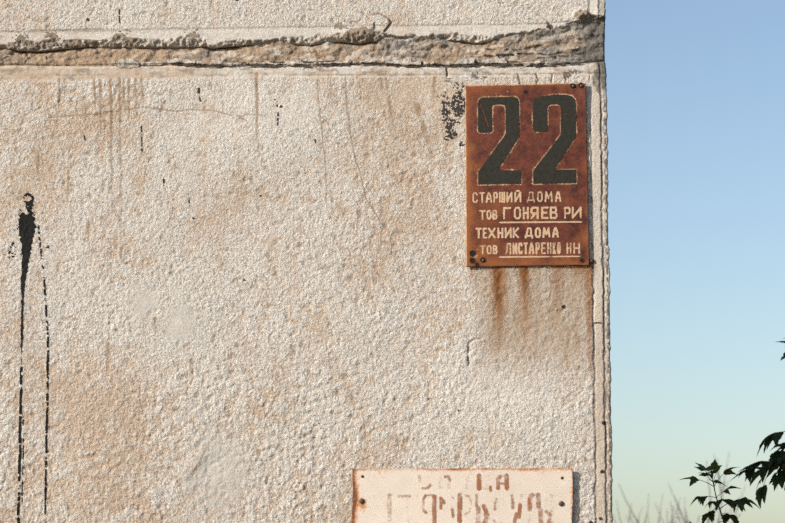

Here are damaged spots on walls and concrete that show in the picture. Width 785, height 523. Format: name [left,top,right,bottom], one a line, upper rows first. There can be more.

spalling [574,10,604,19]
spalling [8,28,143,50]
spalling [333,15,382,43]
peeling [114,57,434,69]
peeling [446,57,507,67]
leakage [93,78,142,169]
rust [489,267,509,338]
rust [517,266,534,317]